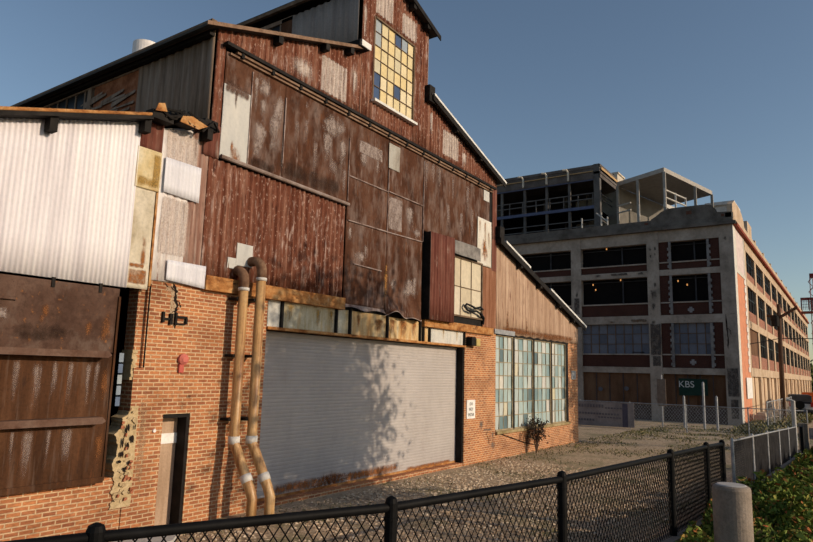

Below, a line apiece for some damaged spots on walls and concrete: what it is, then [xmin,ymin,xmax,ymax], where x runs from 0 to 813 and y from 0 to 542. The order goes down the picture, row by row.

crack [165,283,181,328]
spalling [104,405,139,510]